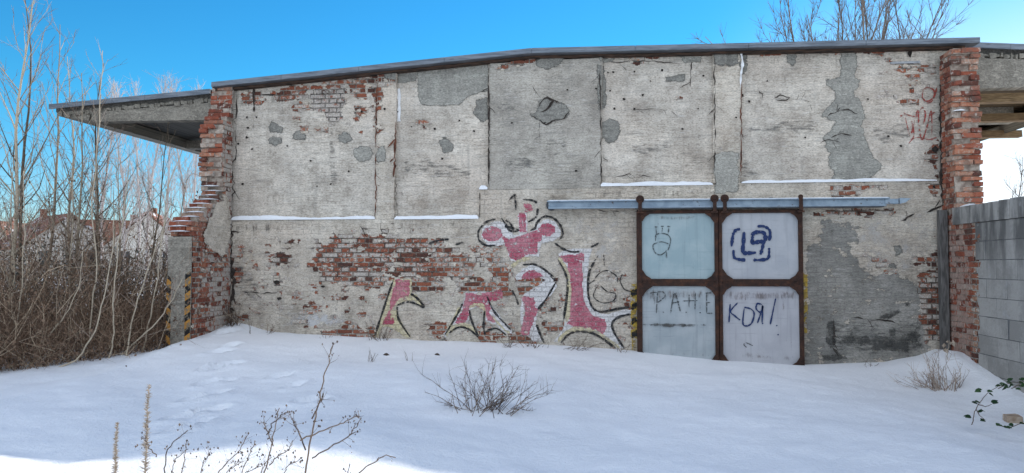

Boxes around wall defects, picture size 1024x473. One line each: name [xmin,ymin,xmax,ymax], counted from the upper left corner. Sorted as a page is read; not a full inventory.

crack [230,89,277,316]
spalling [237,74,398,150]
spalling [230,223,559,341]
flaking render [804,184,939,365]